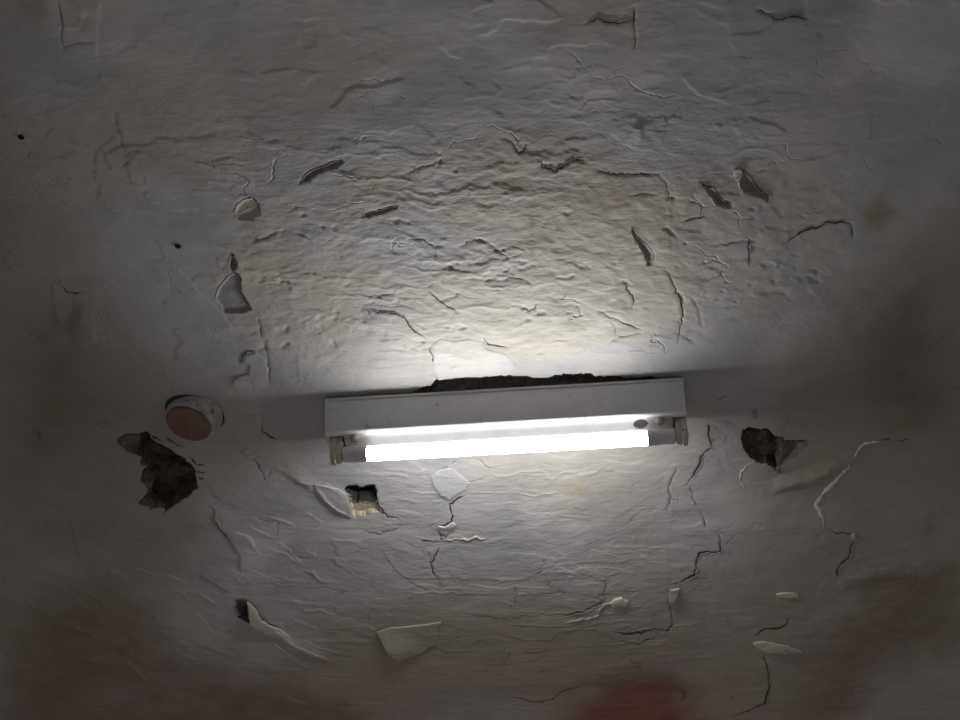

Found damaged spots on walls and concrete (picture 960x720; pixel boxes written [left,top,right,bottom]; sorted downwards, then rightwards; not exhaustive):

crack [506,139,581,172]
flaking render [214,253,251,313]
crack [362,294,434,361]
crack [411,239,537,312]
crack [668,273,701,341]
flaking render [415,373,655,393]
spalling [118,431,204,515]
peeling [312,483,380,519]
crack [422,496,489,583]
crack [620,423,722,645]
spalling [740,427,807,474]
peeling [236,599,292,642]